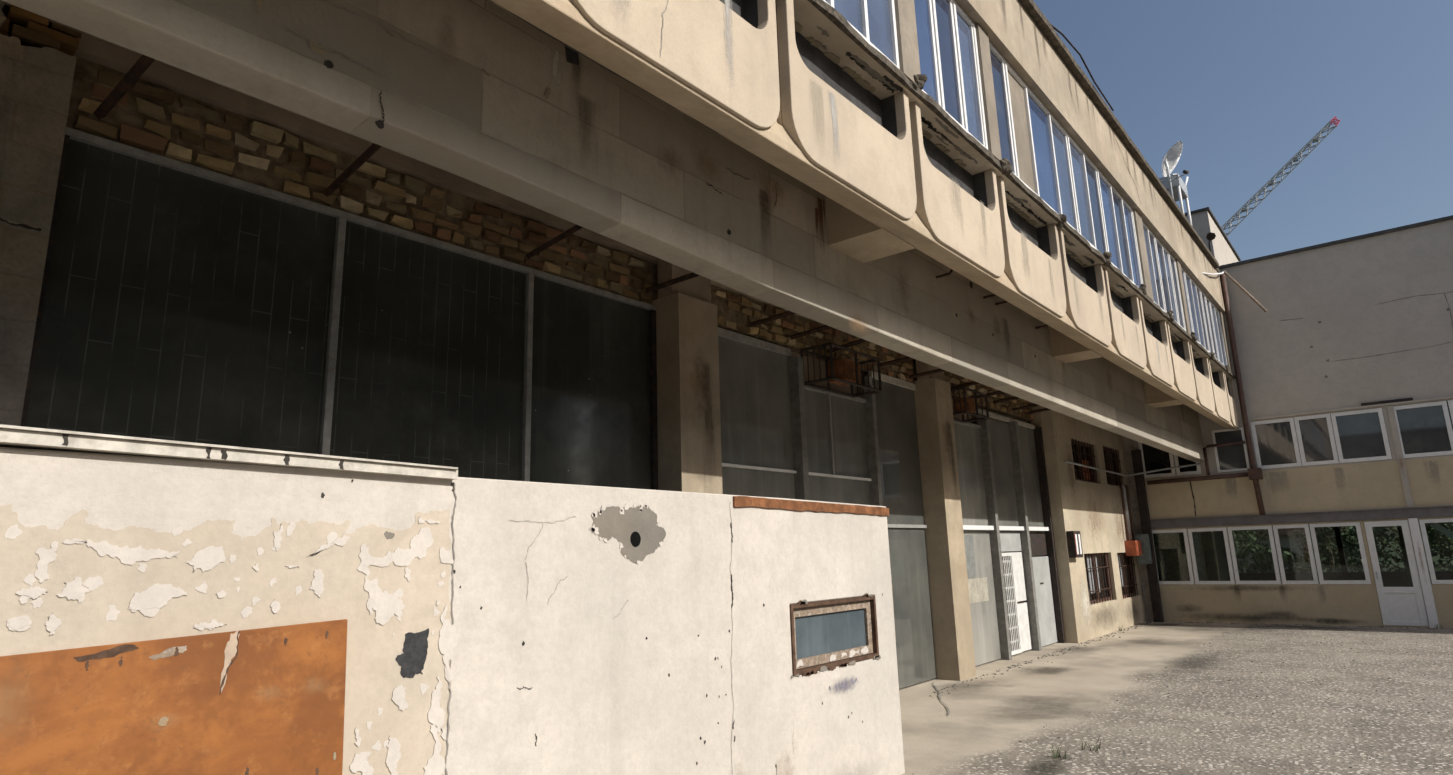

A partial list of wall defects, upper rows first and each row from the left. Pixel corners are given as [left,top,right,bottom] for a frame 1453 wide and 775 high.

peeling [0,504,461,775]